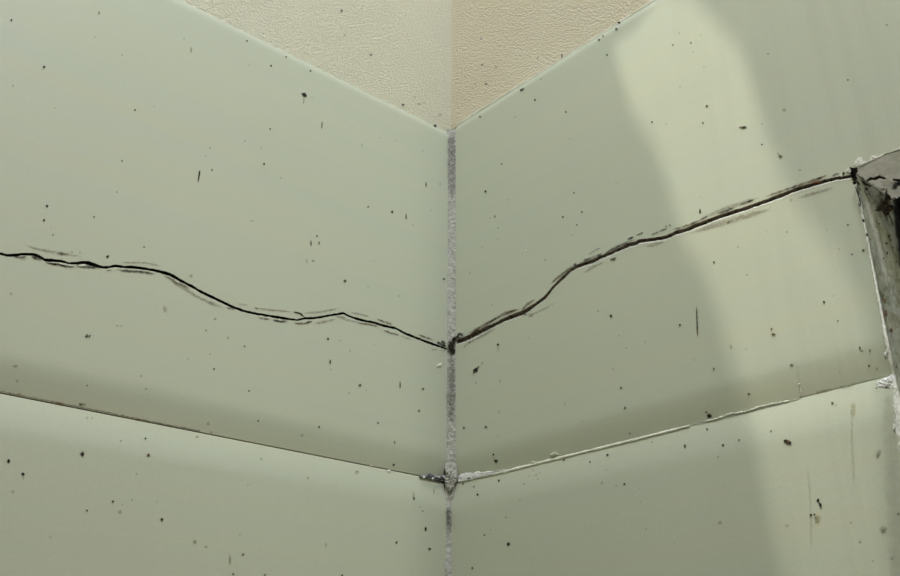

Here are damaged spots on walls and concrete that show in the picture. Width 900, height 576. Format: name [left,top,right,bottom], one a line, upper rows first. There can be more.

crack [0,167,900,351]